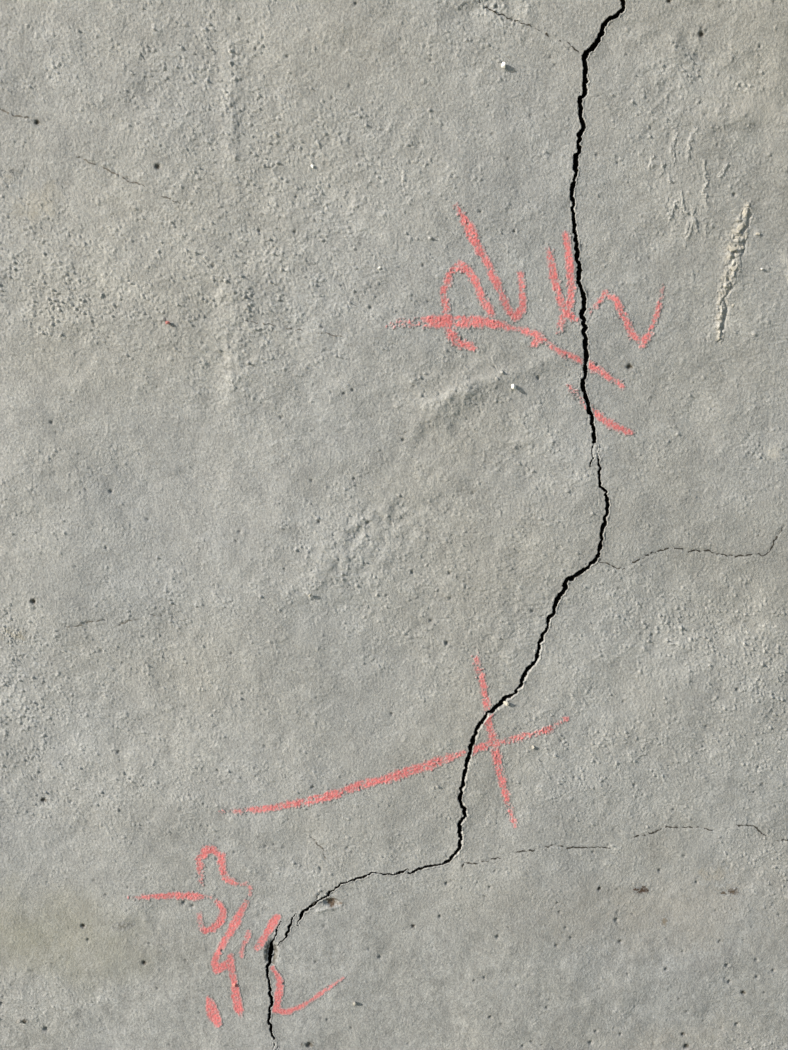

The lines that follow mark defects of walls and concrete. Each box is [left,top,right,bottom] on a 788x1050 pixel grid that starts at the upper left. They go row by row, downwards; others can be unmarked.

crack [244,320,343,337]
crack [264,0,788,1050]